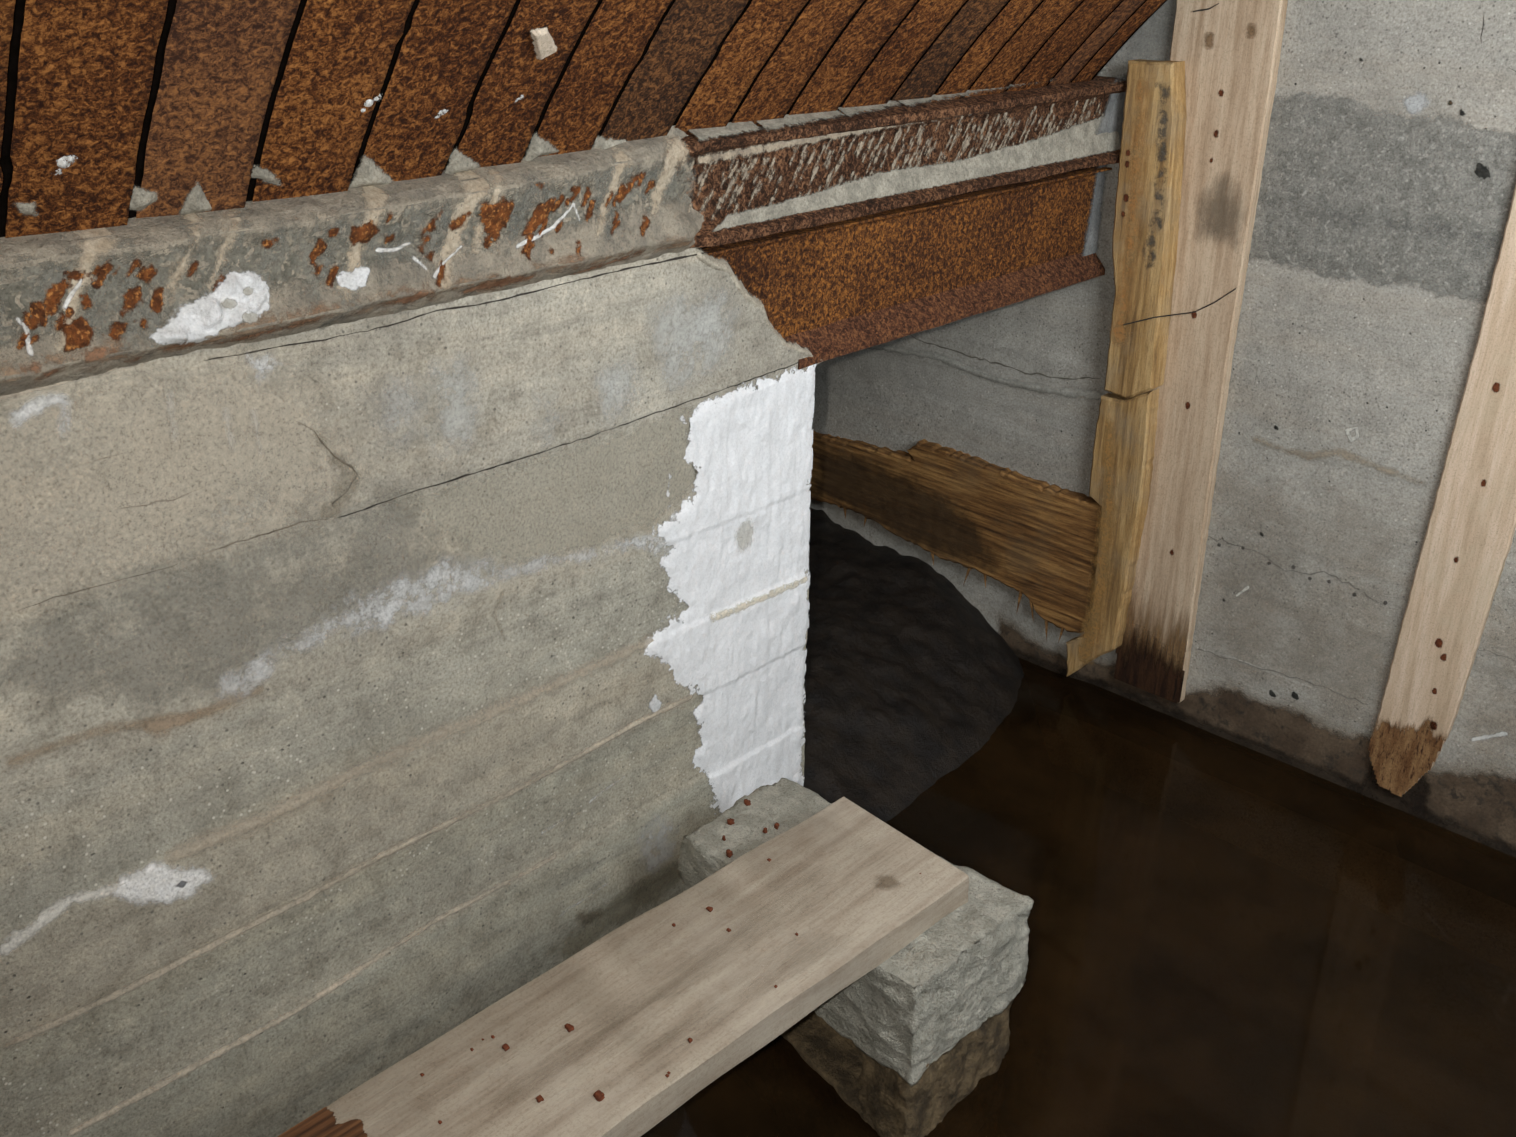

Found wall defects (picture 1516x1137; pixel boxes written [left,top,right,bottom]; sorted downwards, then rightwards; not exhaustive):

rust [0,259,164,382]
rust [158,172,692,352]
crack [204,252,708,361]
damp [0,120,937,355]
damp [1249,93,1516,301]
damp [10,414,694,762]
crack [15,362,798,612]
peeling [626,248,821,814]
damp [1000,422,1516,858]
efflorescence [0,863,212,955]